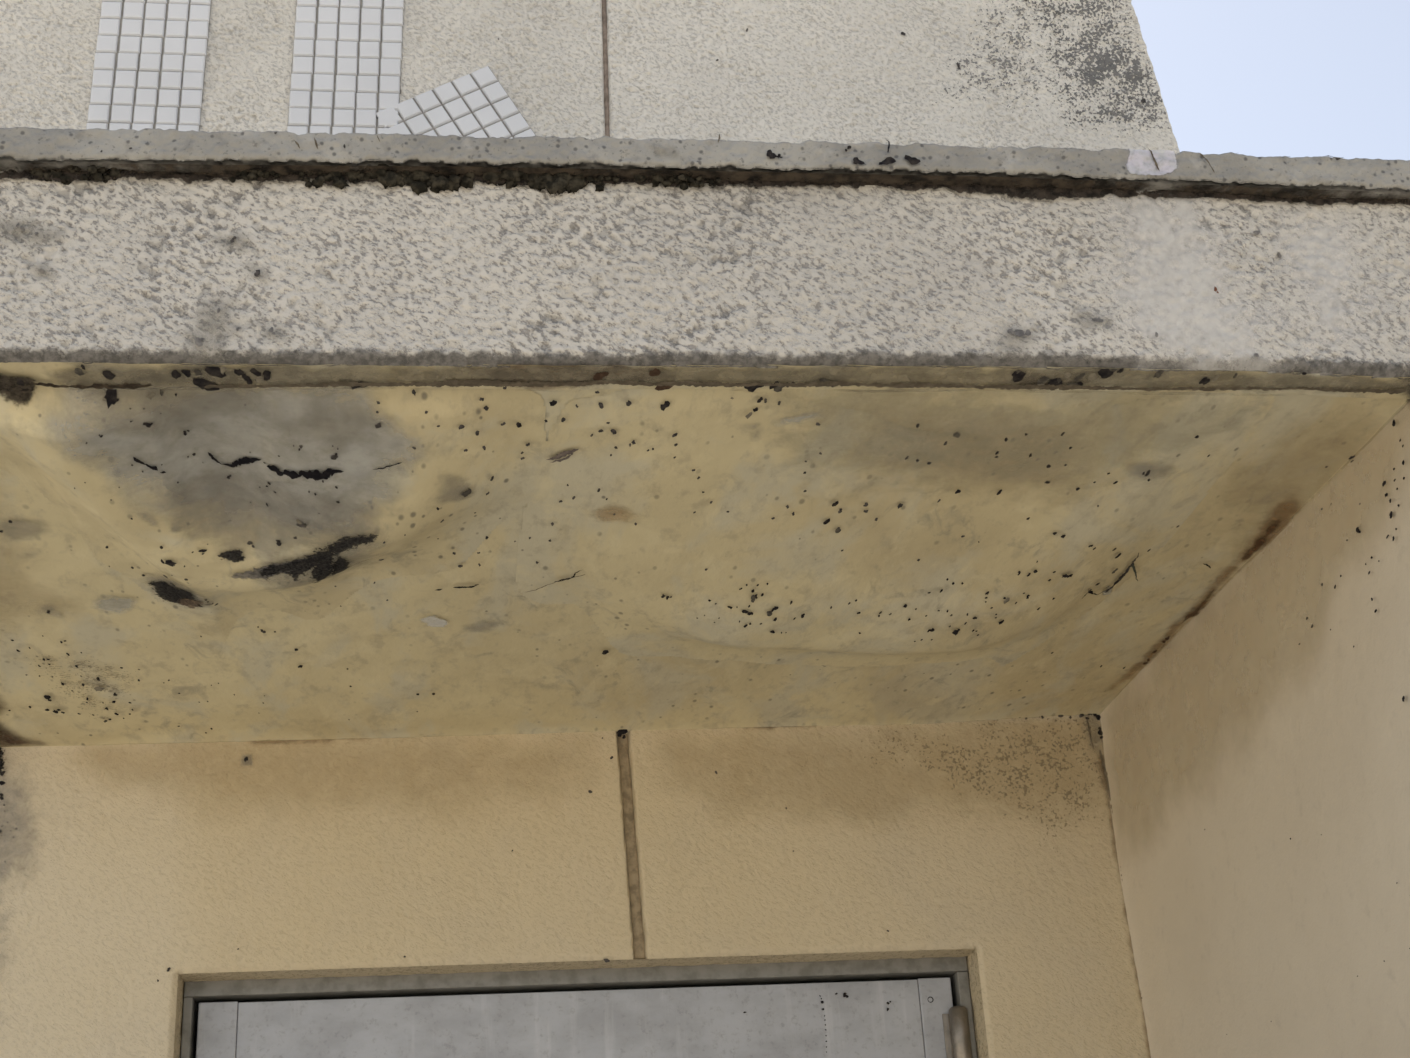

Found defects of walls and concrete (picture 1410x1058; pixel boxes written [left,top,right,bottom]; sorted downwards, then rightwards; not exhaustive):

leakage [0,364,416,529]
leakage [590,391,654,456]
peeling [131,519,378,609]
leakage [697,583,805,634]
leakage [1121,502,1296,681]
leakage [11,640,133,723]
leakage [0,727,31,838]